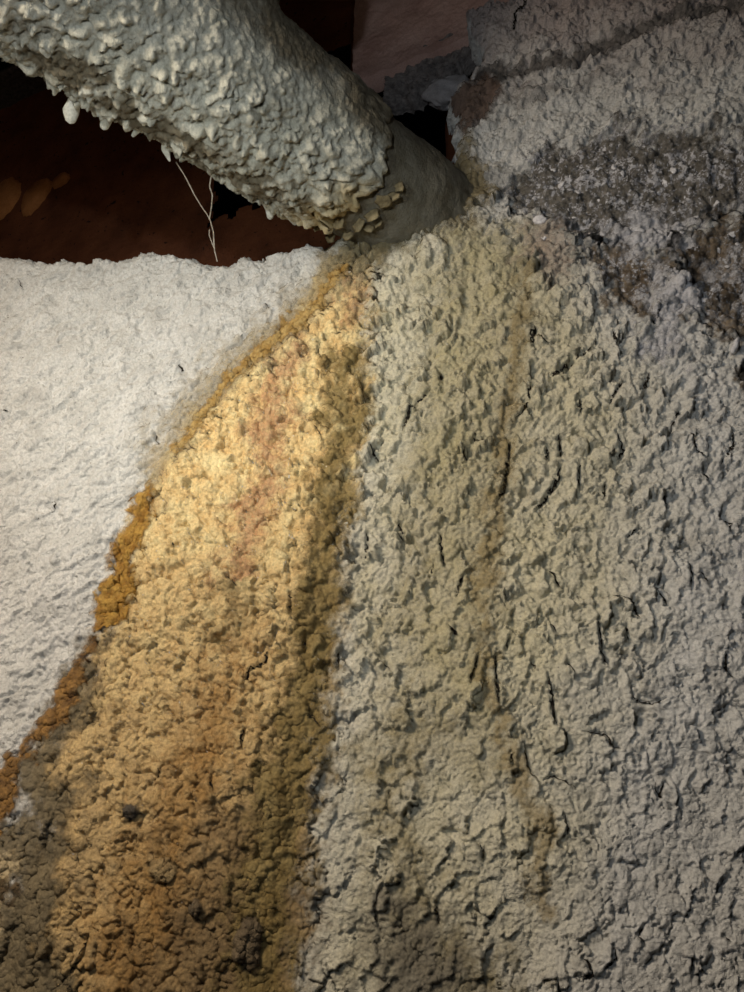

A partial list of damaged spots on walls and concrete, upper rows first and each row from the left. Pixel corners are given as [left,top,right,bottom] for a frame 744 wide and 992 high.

crack [529,325,551,346]
crack [402,375,443,431]
crack [610,374,650,403]
crack [498,444,511,500]
crack [536,435,606,508]
crack [670,412,734,482]
crack [431,532,463,596]
damp [0,237,414,992]
crack [598,595,640,663]
crack [470,639,509,702]
crack [531,662,575,725]
crack [543,948,617,992]